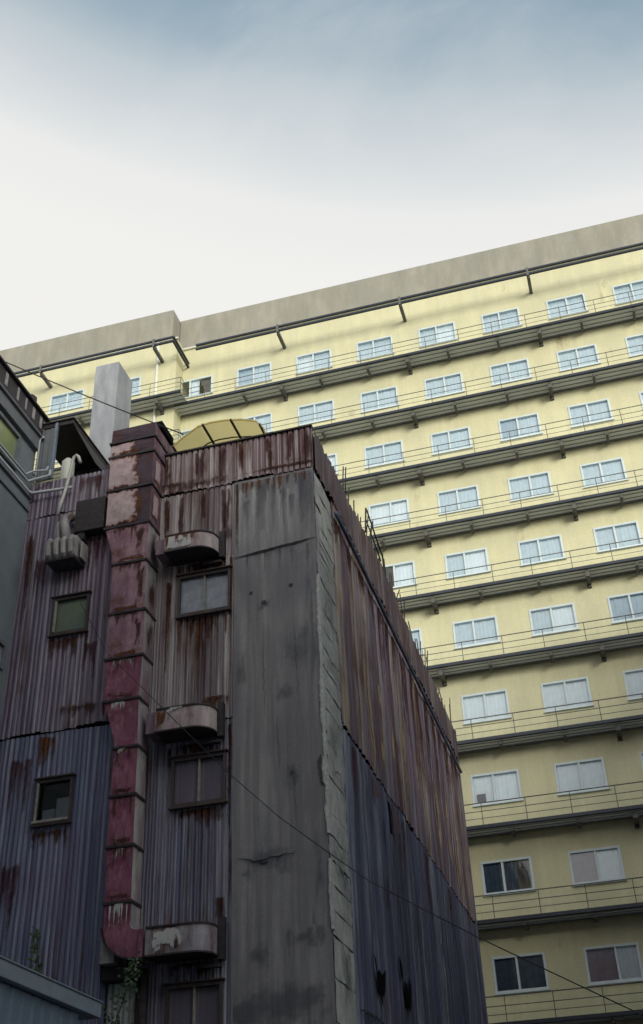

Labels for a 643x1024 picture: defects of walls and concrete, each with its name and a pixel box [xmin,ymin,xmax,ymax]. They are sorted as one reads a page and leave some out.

peeling [106,441,161,527]
rust [87,430,312,667]
spalling [316,573,332,835]
rust [8,736,55,804]
crack [243,853,293,864]
spalling [328,858,336,930]
peeling [152,928,181,952]